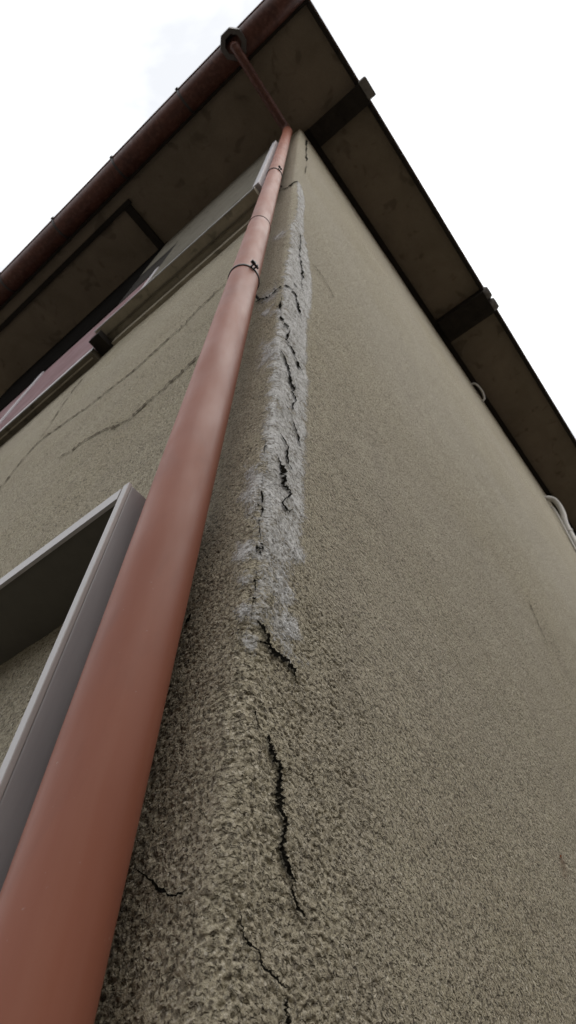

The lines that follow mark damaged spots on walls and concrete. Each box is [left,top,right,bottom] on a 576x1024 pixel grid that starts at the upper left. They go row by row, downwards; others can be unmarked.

crack [0,284,224,487]
crack [251,234,333,683]
crack [137,870,186,897]
crack [240,914,292,1024]
crack [254,711,308,920]